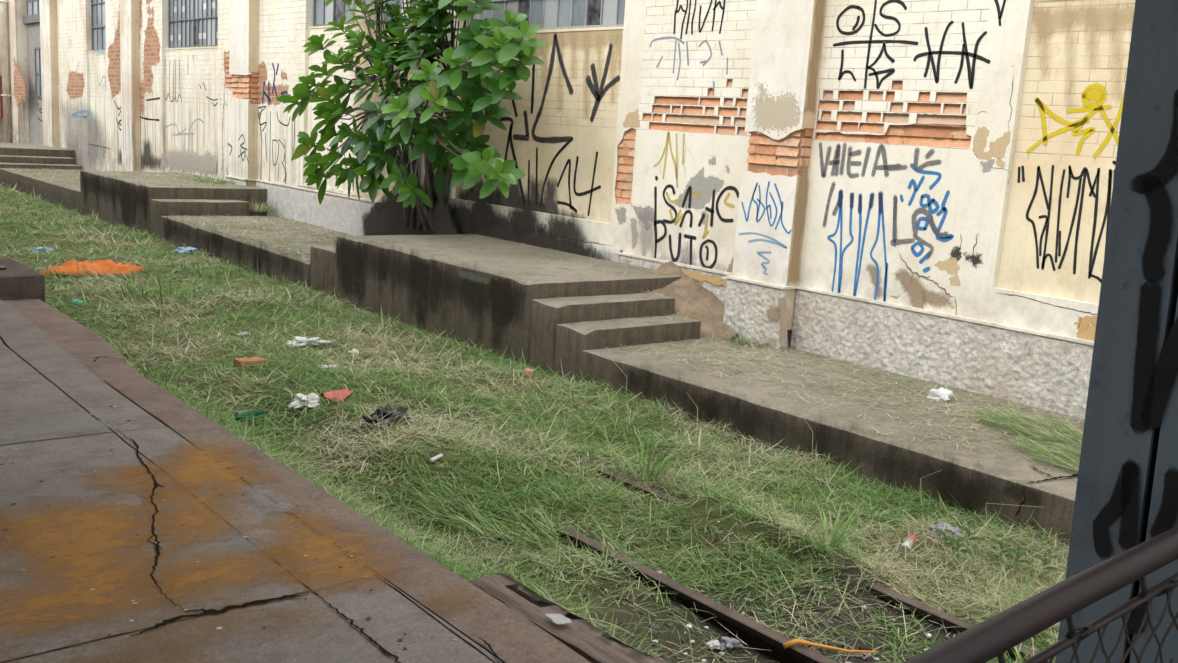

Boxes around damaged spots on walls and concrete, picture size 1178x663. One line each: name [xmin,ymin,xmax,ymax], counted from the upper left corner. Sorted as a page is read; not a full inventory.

peeling [66,71,85,100]
peeling [108,3,121,98]
peeling [139,0,160,116]
spalling [223,51,289,106]
spalling [616,79,1011,248]
damp [868,265,882,297]
damp [896,270,951,309]
corrosion [0,445,395,635]
crack [117,429,401,663]
crack [478,637,504,663]